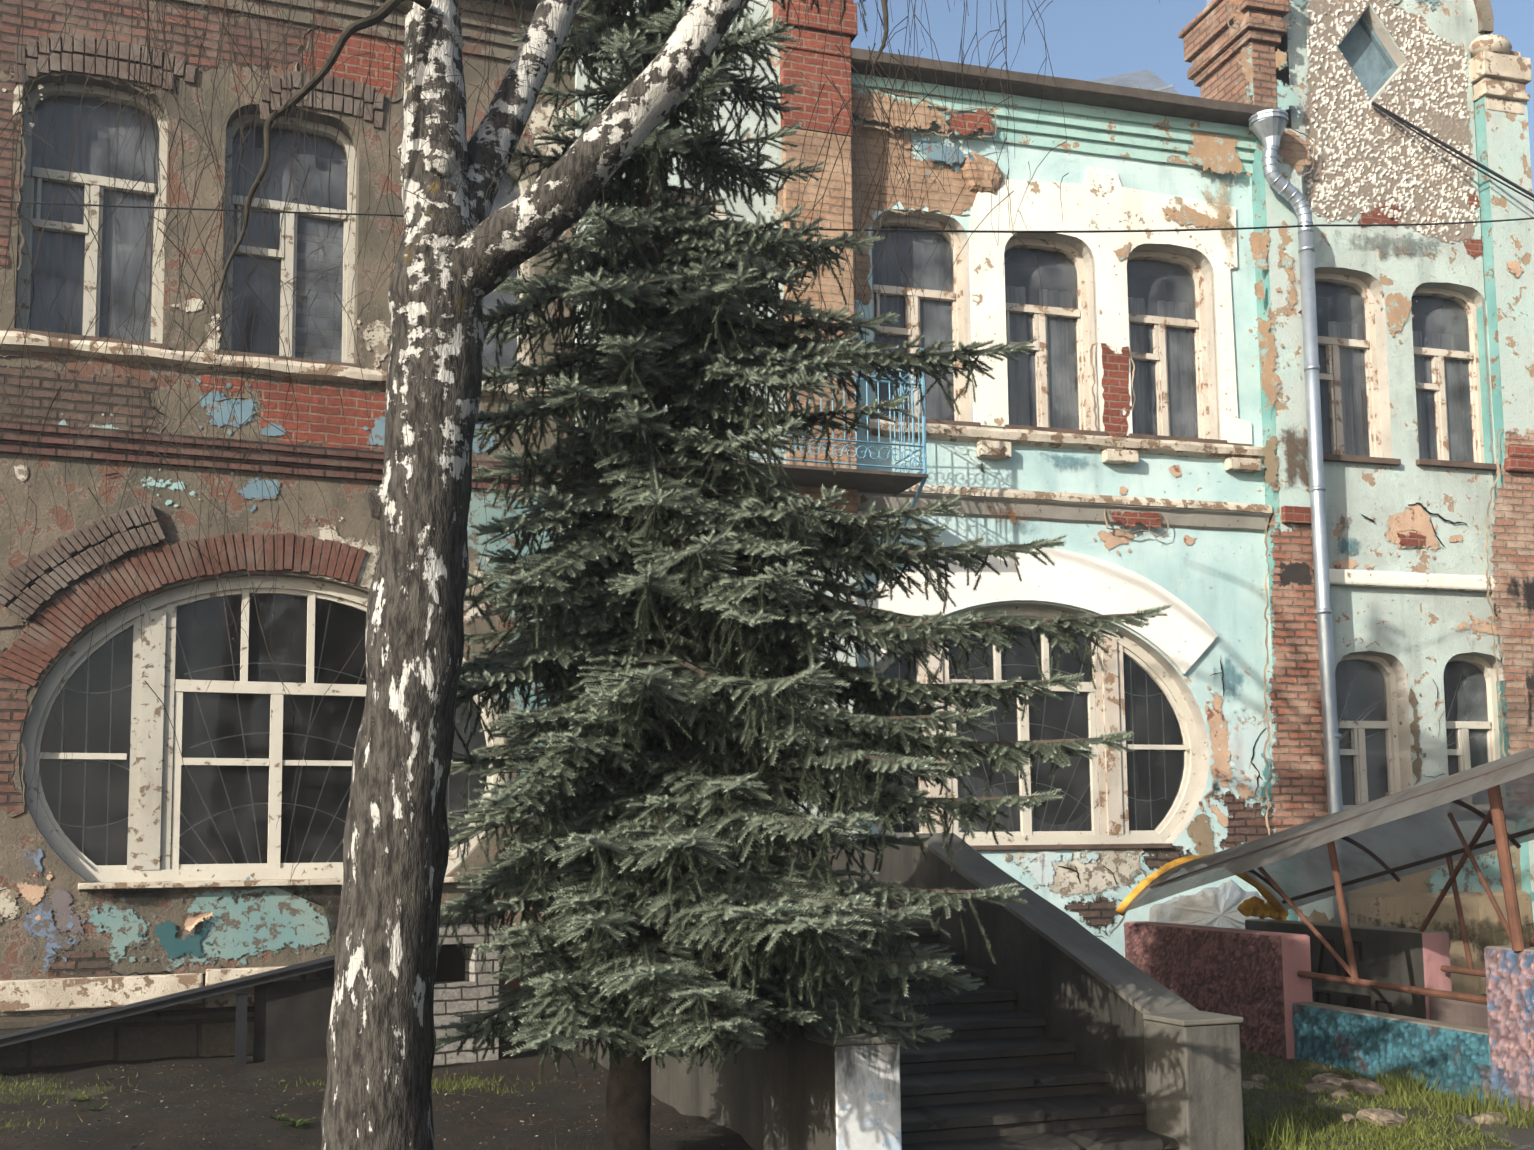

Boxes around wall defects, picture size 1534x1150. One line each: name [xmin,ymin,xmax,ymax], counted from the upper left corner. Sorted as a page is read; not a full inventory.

spalling [851,84,997,305]
flaking render [1162,203,1229,240]
flaking render [1179,131,1251,185]
spalling [0,355,386,451]
spalling [1090,343,1136,438]
flaking render [1240,216,1298,497]
spalling [1372,501,1463,559]
spalling [1451,428,1534,757]
spalling [1137,521,1328,884]
spalling [1394,688,1431,786]
spalling [1064,895,1124,939]
spalling [1149,879,1272,929]